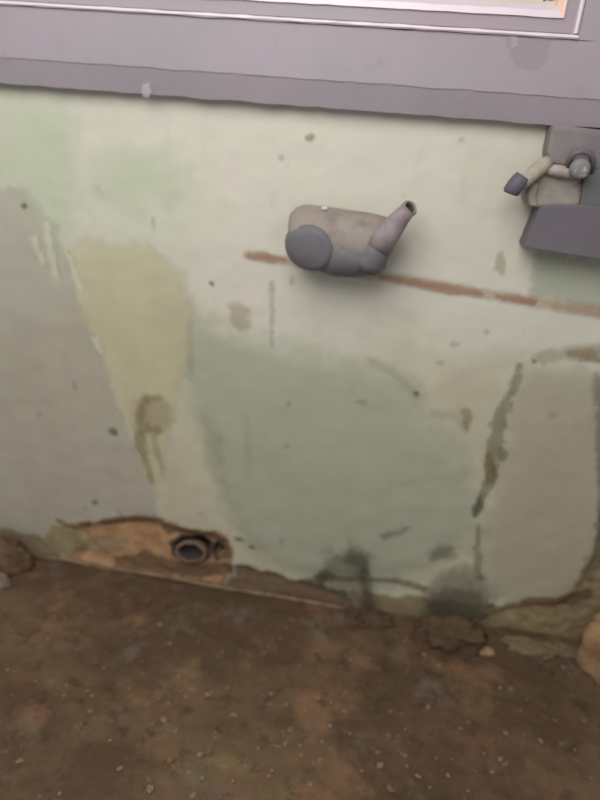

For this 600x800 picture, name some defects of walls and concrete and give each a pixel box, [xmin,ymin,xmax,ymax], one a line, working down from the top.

spalling [44,515,352,607]
spalling [472,523,600,639]